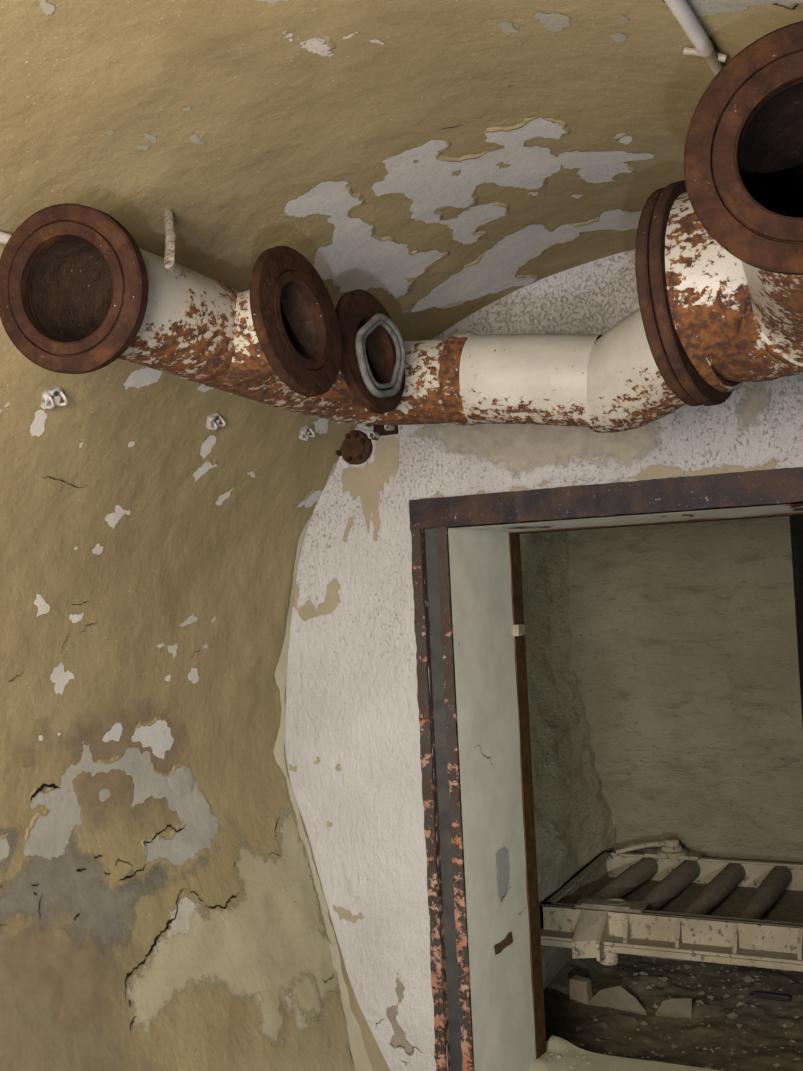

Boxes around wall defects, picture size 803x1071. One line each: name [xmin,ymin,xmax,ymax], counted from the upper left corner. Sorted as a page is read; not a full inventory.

peeling [284,117,654,312]
peeling [105,505,131,529]
peeling [34,594,50,617]
peeling [50,662,74,694]
peeling [125,435,400,1071]
crack [31,784,60,800]
peeling [23,716,219,866]
peeling [0,833,10,861]
crack [76,824,186,881]
crack [125,890,239,1030]
spalling [385,973,415,1056]